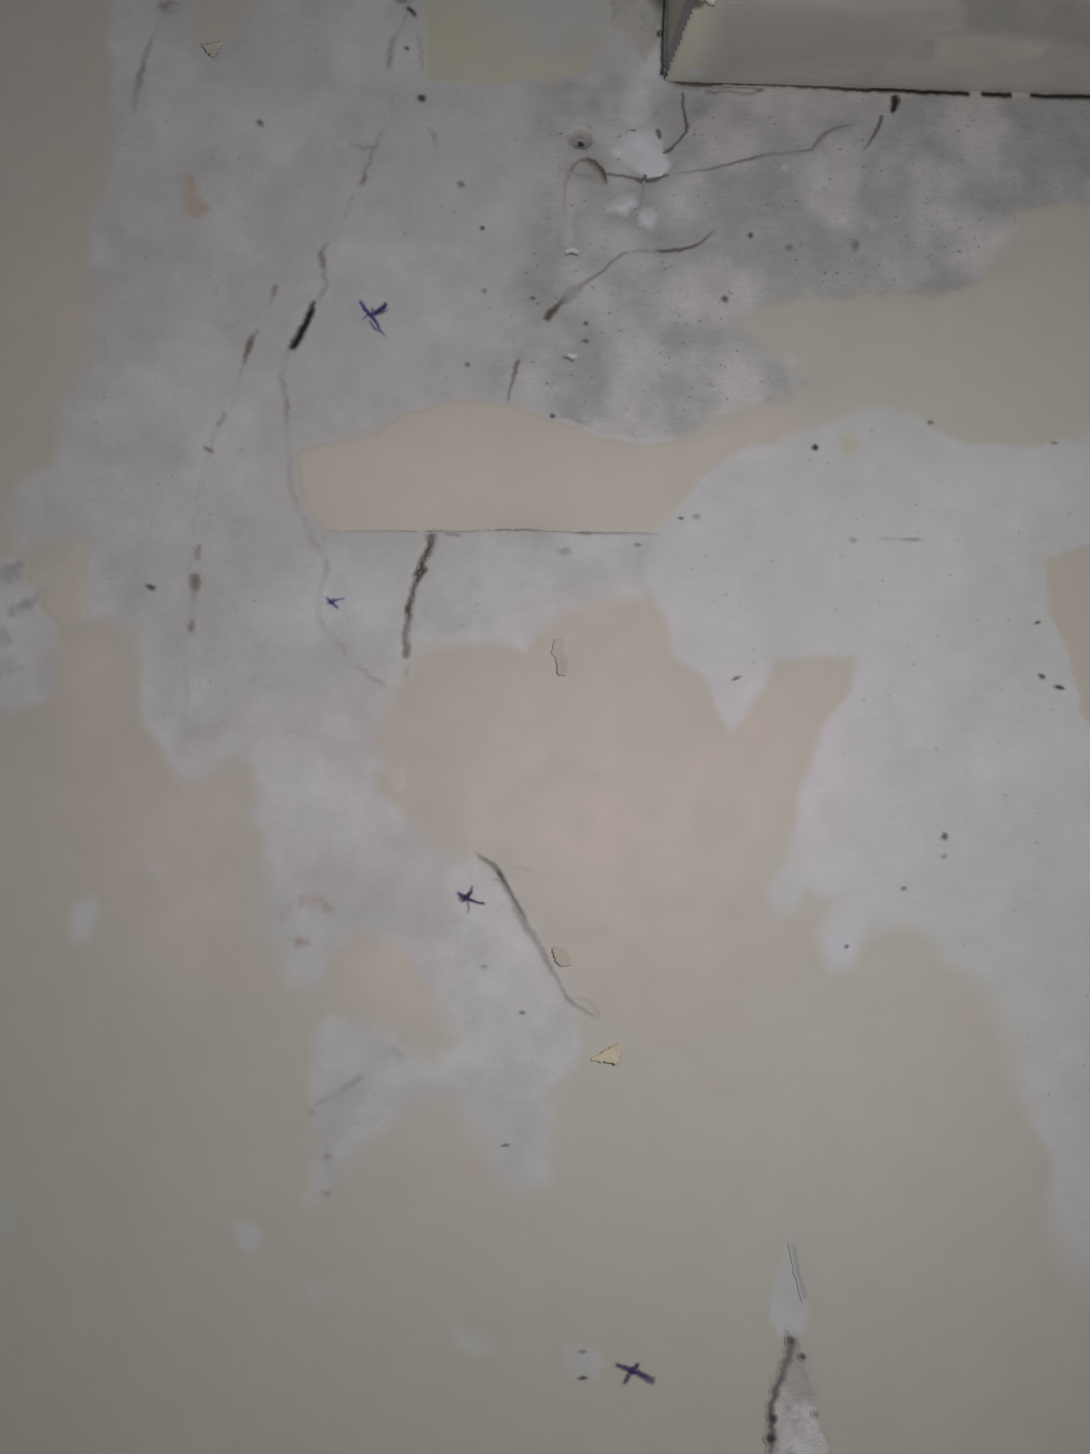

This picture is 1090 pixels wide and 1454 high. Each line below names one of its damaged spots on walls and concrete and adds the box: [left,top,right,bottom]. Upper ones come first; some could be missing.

crack [181,0,663,747]
spalling [452,0,1090,440]
crack [541,0,1090,324]
peeling [0,0,655,1215]
spalling [1036,672,1067,691]
crack [473,848,603,1021]
spalling [940,831,949,860]
spalling [763,1329,831,1454]